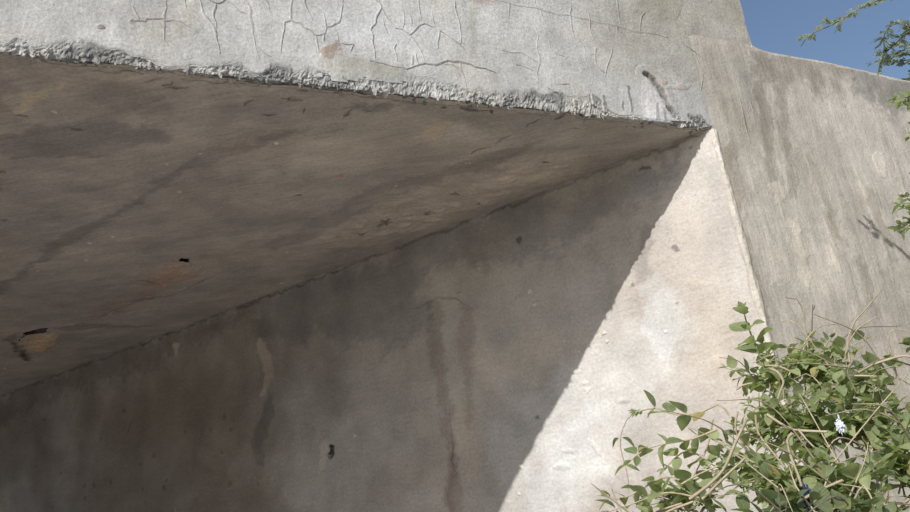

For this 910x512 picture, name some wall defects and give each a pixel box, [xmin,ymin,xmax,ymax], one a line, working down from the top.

damp [0,70,184,161]
damp [0,126,316,296]
crack [0,0,715,399]
spalling [0,23,782,373]
damp [174,131,706,512]